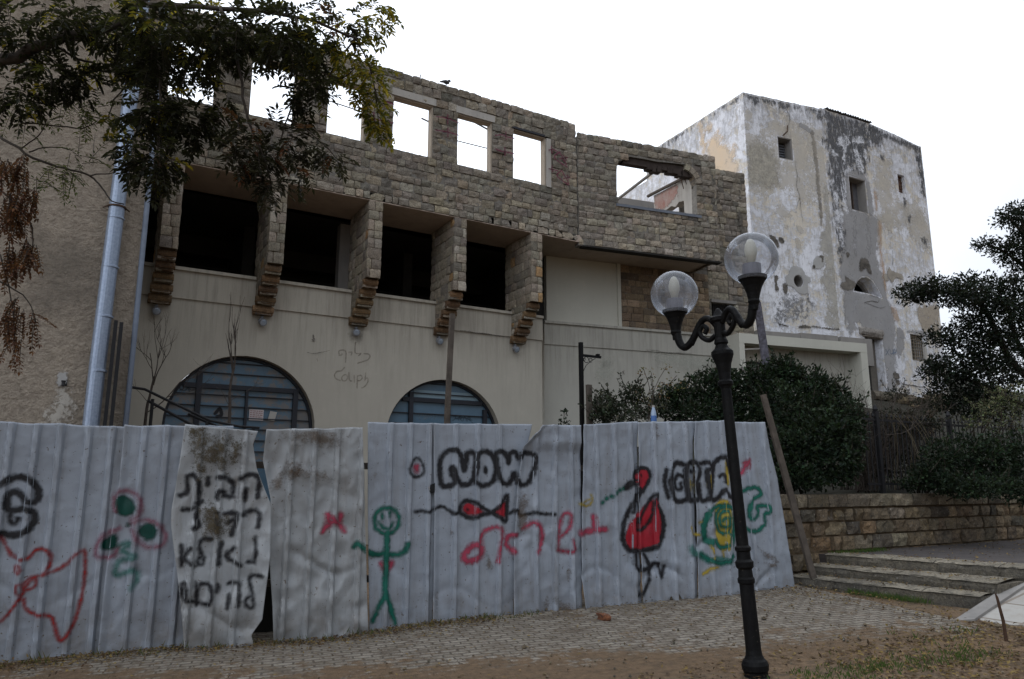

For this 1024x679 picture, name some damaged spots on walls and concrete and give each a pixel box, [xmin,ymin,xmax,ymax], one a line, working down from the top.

peeling [698,109,931,330]
water stain [709,95,926,263]
peeling [897,305,940,358]